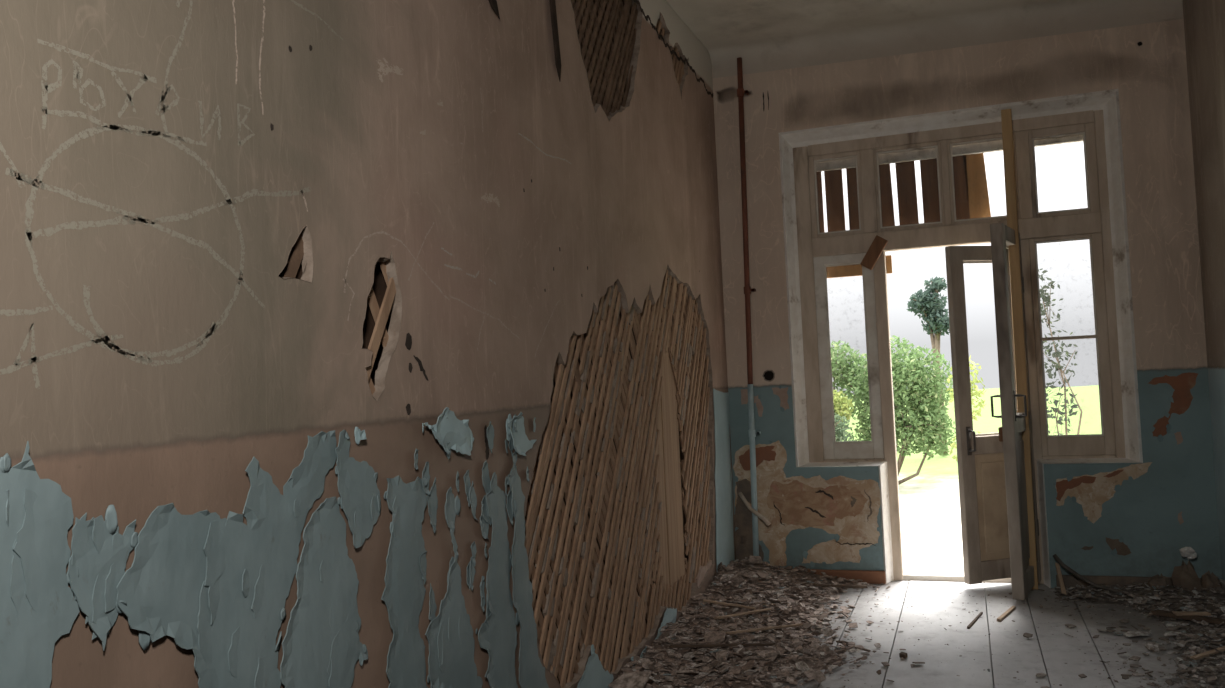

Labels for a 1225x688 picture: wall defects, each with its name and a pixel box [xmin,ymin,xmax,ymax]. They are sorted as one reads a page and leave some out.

spalling [571,0,689,121]
crack [633,0,713,98]
spalling [278,226,313,283]
peeling [1147,372,1198,445]
spalling [0,251,881,688]
peeling [1055,462,1152,524]